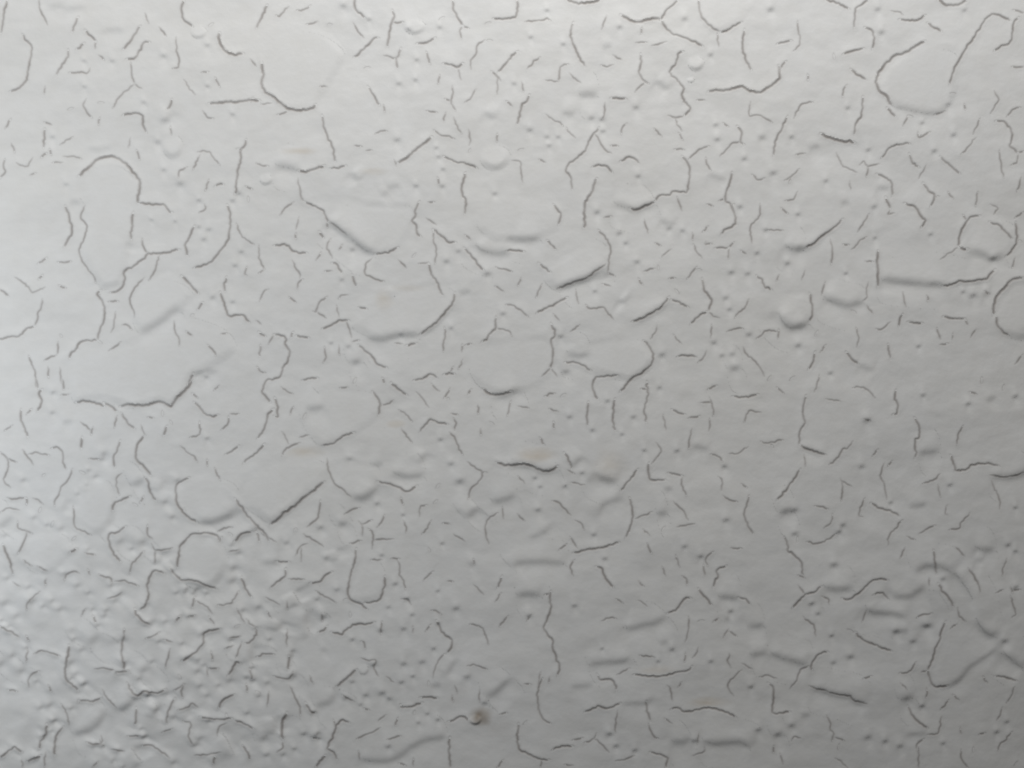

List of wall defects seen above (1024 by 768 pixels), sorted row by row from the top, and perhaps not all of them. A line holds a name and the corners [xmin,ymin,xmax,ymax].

crack [818,0,1024,230]
crack [0,0,855,626]
crack [862,416,873,424]
crack [803,212,978,367]
crack [890,388,923,461]
crack [924,190,1024,339]
crack [0,623,119,768]
crack [62,430,471,768]
crack [468,613,511,647]
crack [497,549,739,768]
crack [724,424,1024,718]
crack [897,548,1020,768]